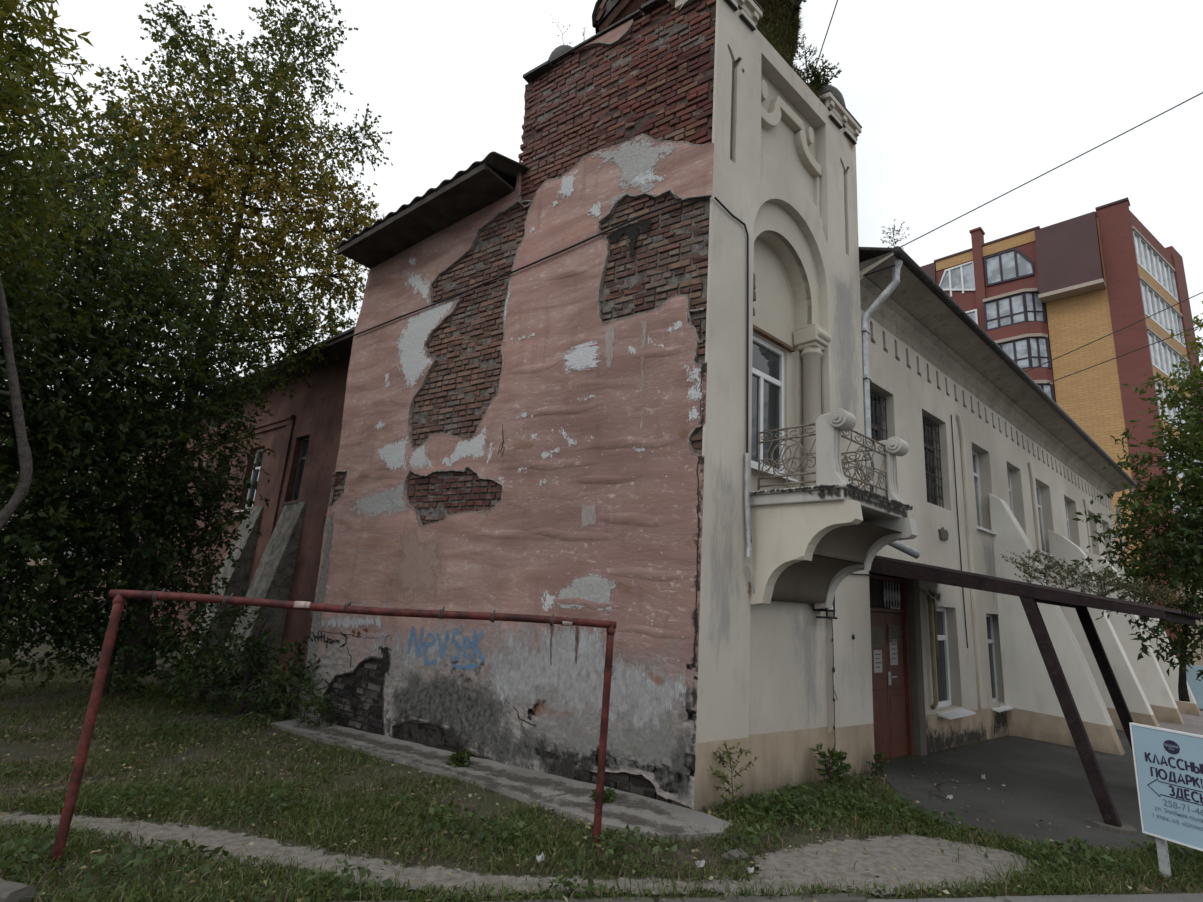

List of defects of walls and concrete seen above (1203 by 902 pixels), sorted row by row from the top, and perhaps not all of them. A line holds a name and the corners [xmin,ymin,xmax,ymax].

spalling [377,0,716,528]
peeling [294,469,348,684]
peeling [541,590,555,611]
spalling [677,528,701,668]
spalling [321,656,494,761]
water stain [321,615,693,798]